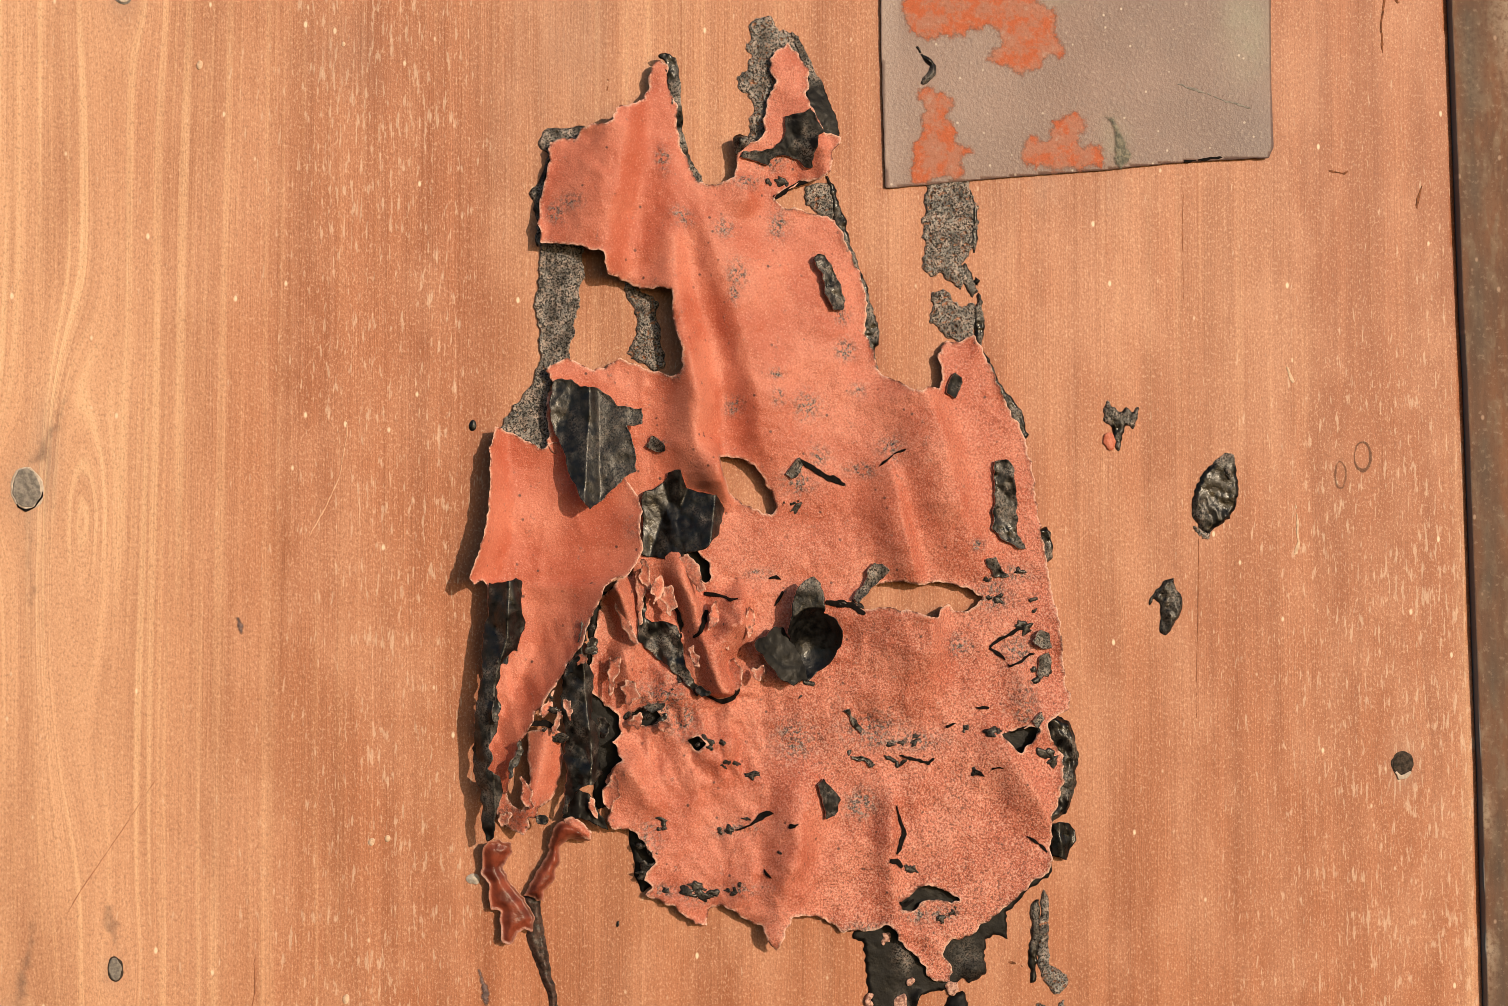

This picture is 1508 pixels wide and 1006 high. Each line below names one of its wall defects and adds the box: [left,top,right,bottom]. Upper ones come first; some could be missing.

peeling [466,15,1079,1006]
peeling [1103,432,1116,450]